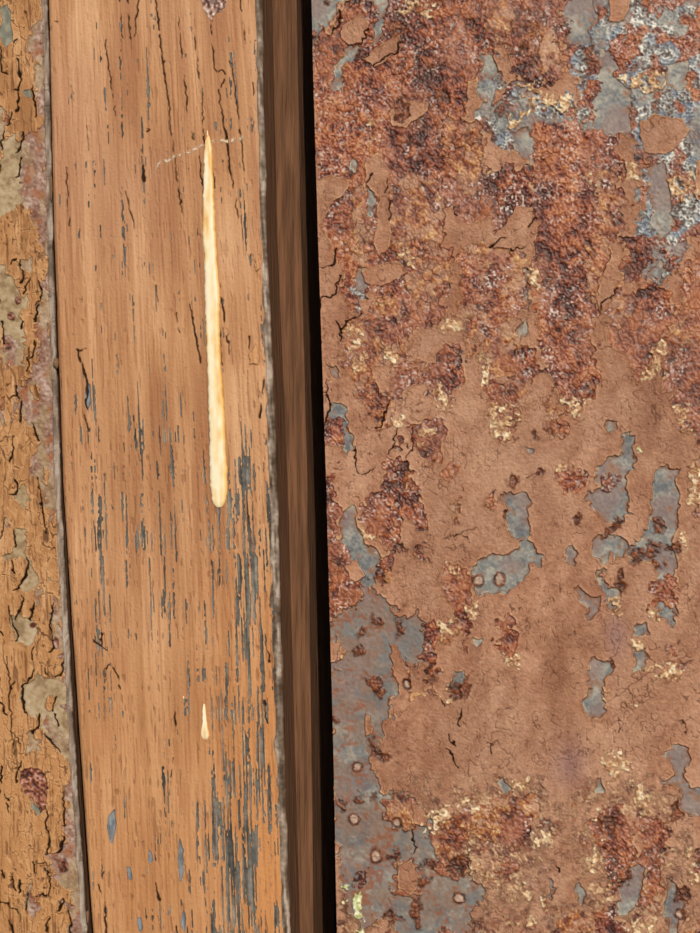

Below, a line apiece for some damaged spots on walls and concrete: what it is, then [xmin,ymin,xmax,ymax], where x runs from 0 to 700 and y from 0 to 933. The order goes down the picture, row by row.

crack [0,39,37,178]
corrosion [313,0,700,705]
peeling [0,0,195,933]
peeling [471,492,545,596]
peeling [565,545,578,567]
peeling [574,420,688,672]
peeling [330,504,486,933]
corrosion [337,905,390,933]
corrosion [380,772,700,933]